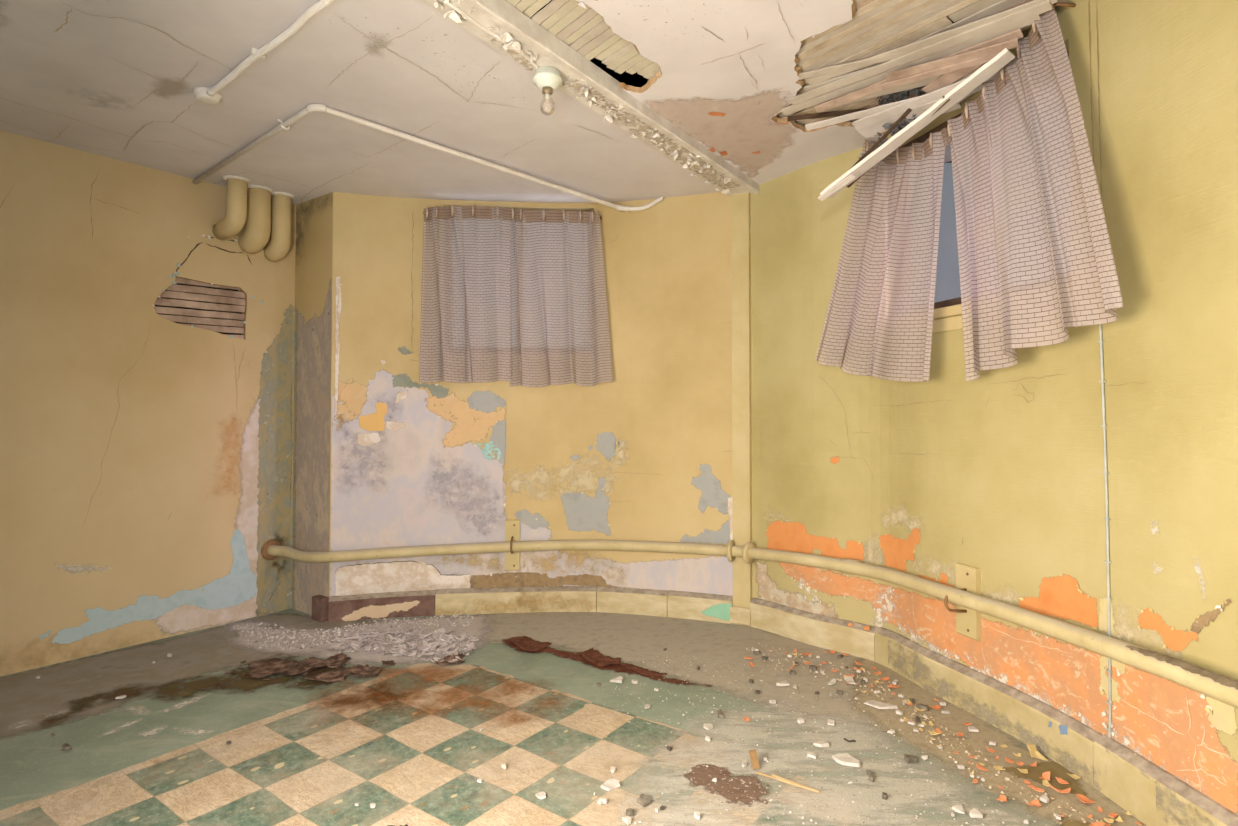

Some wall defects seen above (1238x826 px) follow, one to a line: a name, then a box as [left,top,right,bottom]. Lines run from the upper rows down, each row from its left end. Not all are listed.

crack [0,2,433,203]
crack [326,14,535,158]
peeling [432,0,478,24]
peeling [488,27,538,70]
peeling [566,79,741,194]
spalling [152,263,264,340]
flaking render [0,275,733,738]
peeling [755,510,1238,814]